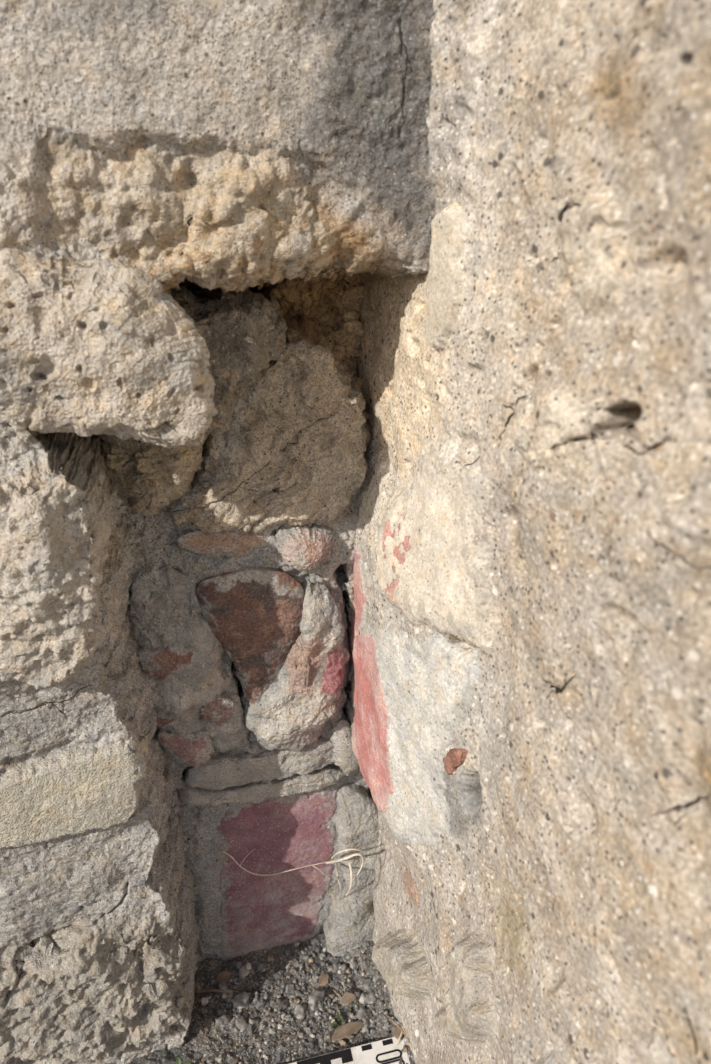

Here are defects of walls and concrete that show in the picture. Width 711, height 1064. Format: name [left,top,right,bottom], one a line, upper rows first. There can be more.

crack [399,21,412,137]
crack [550,423,671,455]
crack [1,685,92,717]
peeling [343,438,495,850]